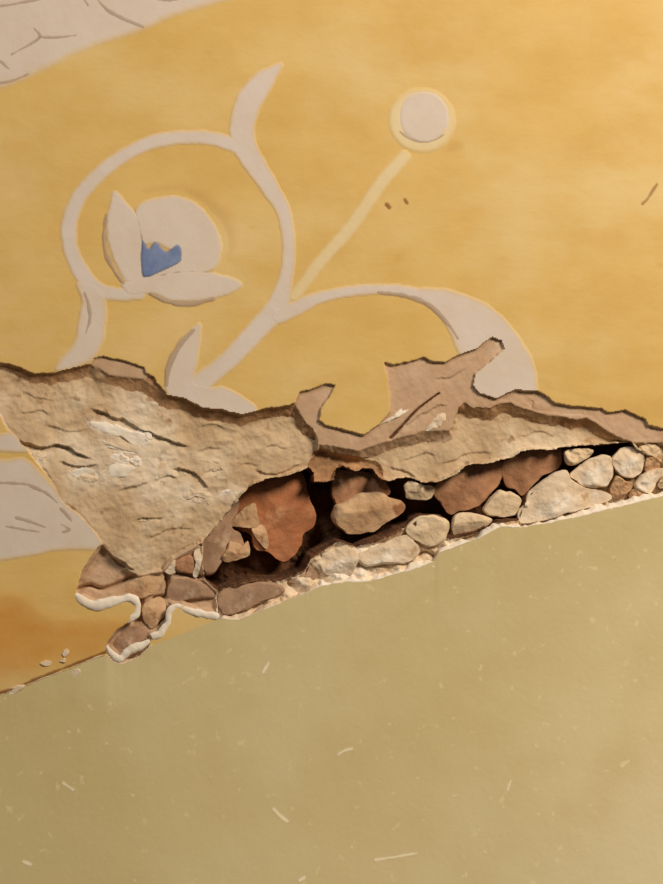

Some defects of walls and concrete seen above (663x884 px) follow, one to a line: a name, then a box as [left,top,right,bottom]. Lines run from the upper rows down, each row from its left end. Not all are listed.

flaking render [0,337,663,665]